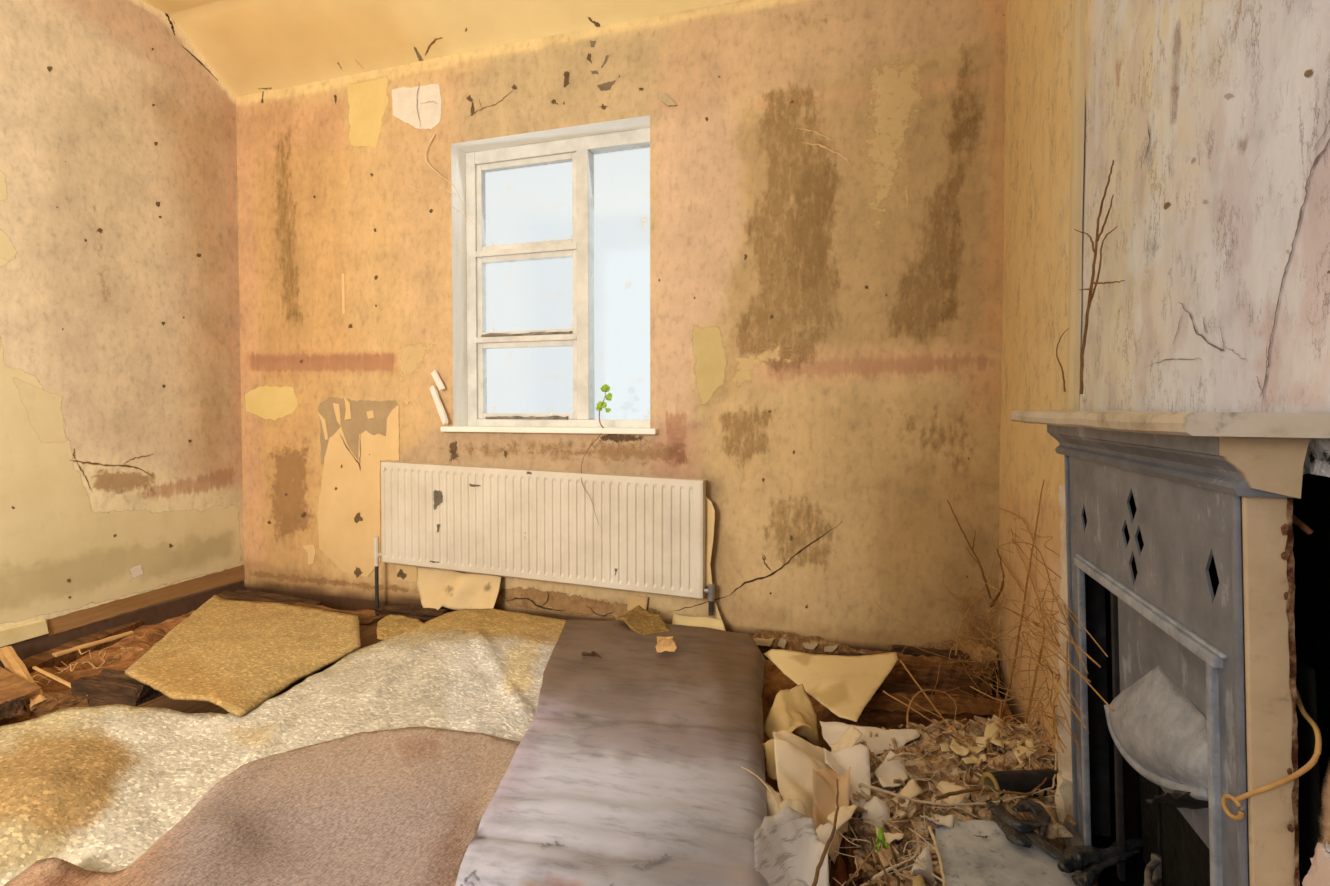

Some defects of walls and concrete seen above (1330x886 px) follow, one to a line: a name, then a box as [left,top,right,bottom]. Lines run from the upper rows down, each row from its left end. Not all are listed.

leakage [739,90,839,367]
leakage [893,62,977,339]
crack [71,448,153,491]
peeling [0,337,241,624]
peeling [303,397,417,582]
crack [671,527,836,612]